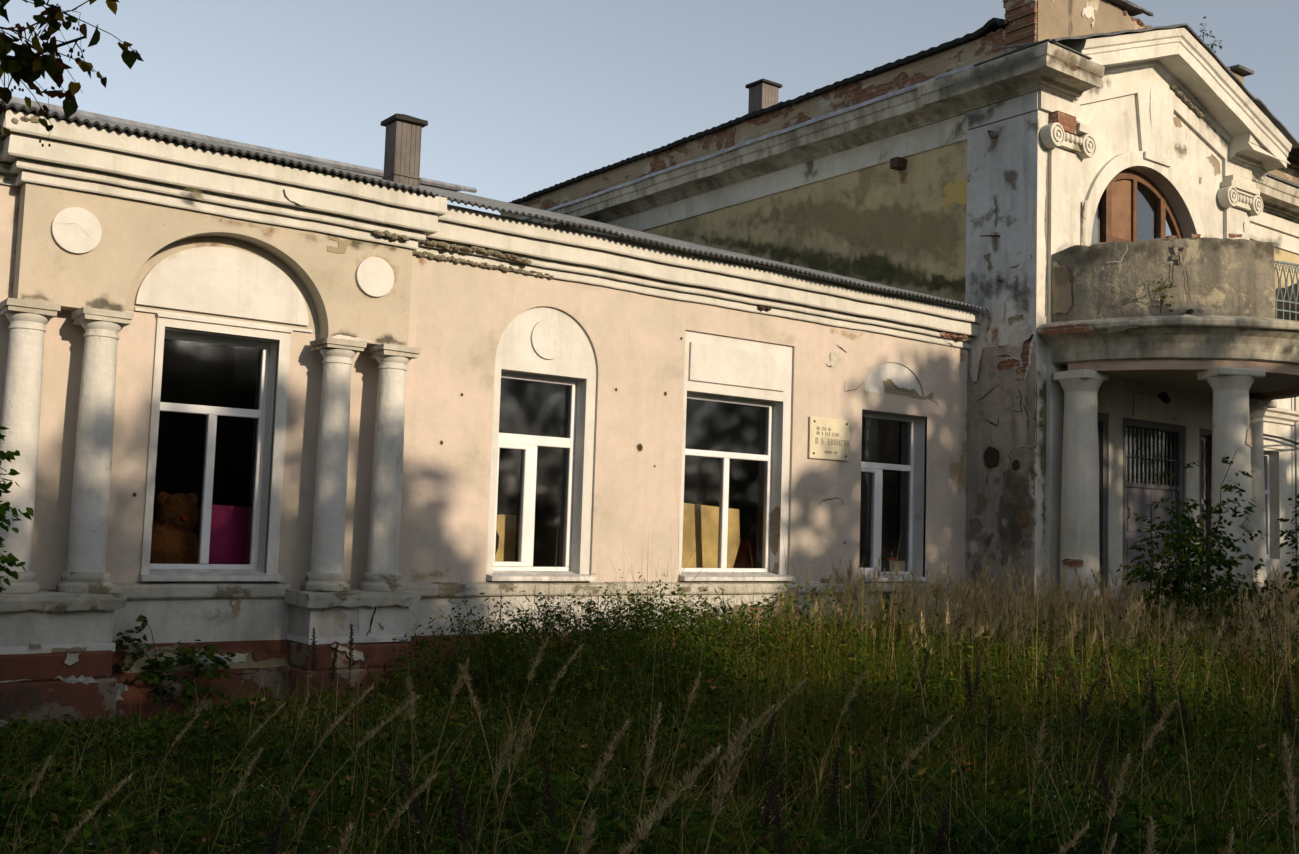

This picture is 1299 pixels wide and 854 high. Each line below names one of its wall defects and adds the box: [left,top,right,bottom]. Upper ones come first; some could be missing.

peeling [996,159,1155,380]
damp [1068,245,1109,262]
peeling [940,331,982,382]
peeling [883,378,934,400]
spalling [29,643,291,703]
spalling [329,641,365,662]